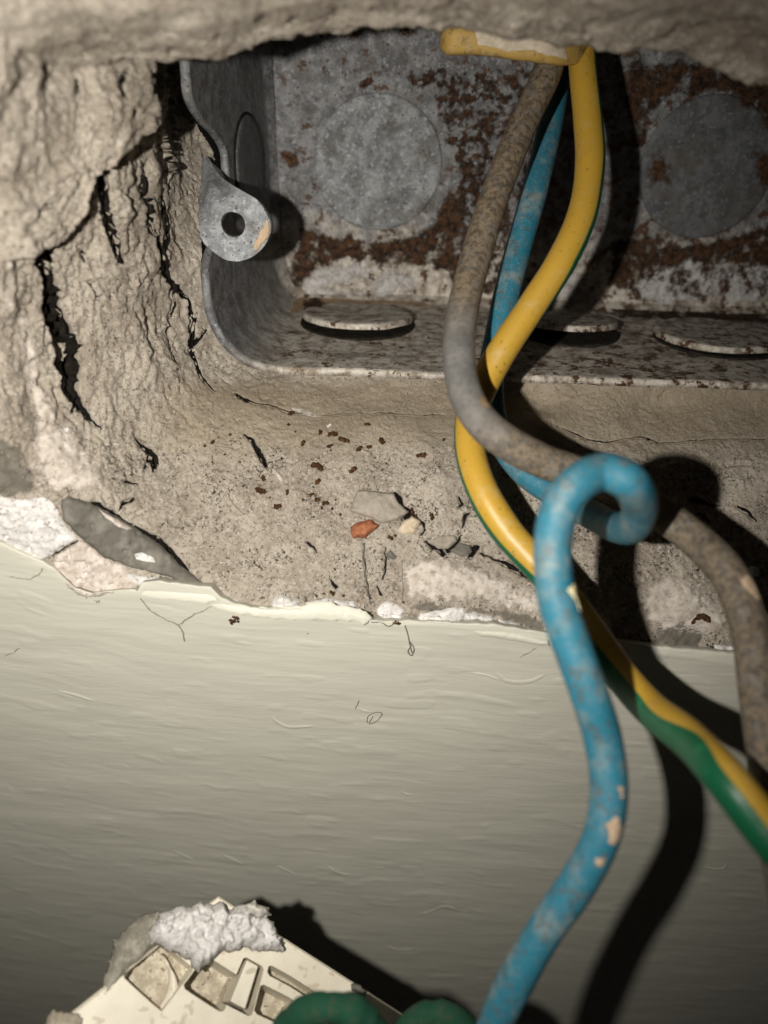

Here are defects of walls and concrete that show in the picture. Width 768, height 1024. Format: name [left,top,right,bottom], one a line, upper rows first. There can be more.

corrosion [625,60,768,149]
crack [36,243,101,431]
crack [98,170,123,264]
crack [115,70,444,416]
corrosion [280,151,298,168]
corrosion [303,297,323,310]
corrosion [290,67,532,294]
corrosion [608,225,768,323]
spalling [0,496,405,625]
peeling [398,516,421,534]
peeling [428,535,457,549]
spalling [418,607,549,646]